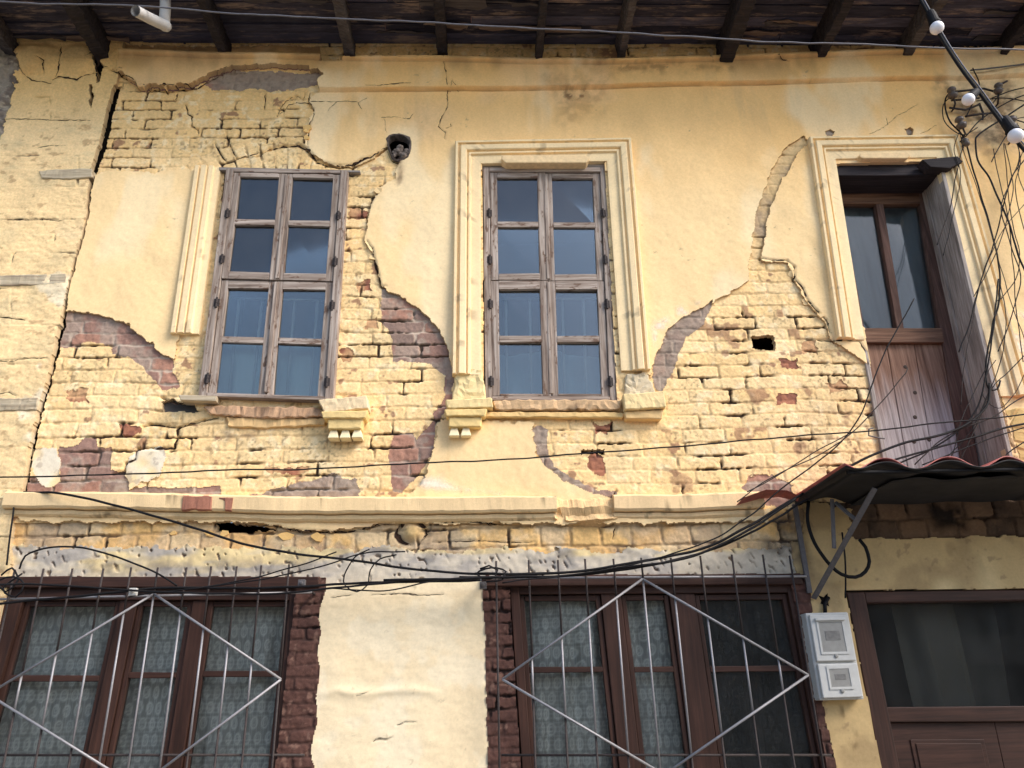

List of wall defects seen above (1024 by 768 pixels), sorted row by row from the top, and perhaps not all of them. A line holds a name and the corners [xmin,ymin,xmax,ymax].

crack [2,49,413,210]
spalling [231,43,716,61]
spalling [736,45,810,54]
spalling [13,68,1024,554]
crack [0,304,68,491]